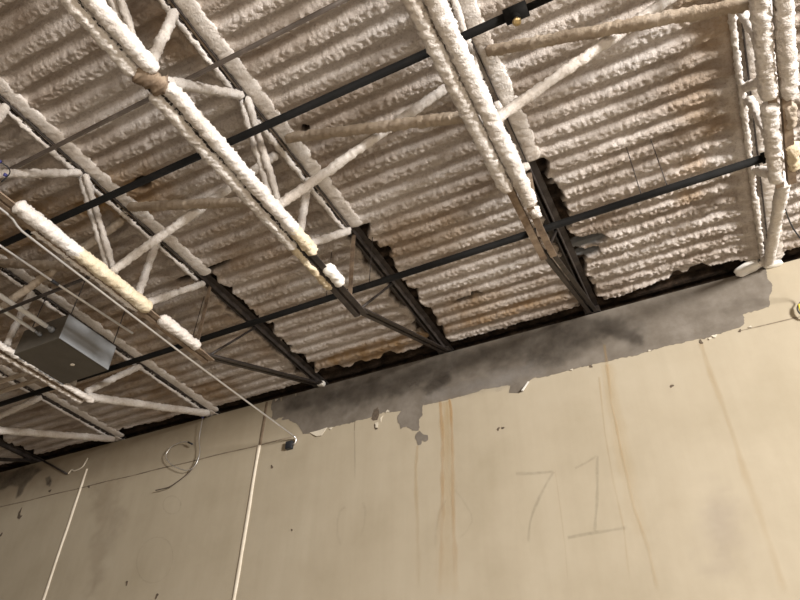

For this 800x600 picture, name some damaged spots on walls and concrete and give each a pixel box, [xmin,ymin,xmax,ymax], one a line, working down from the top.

peeling [271,268,773,445]